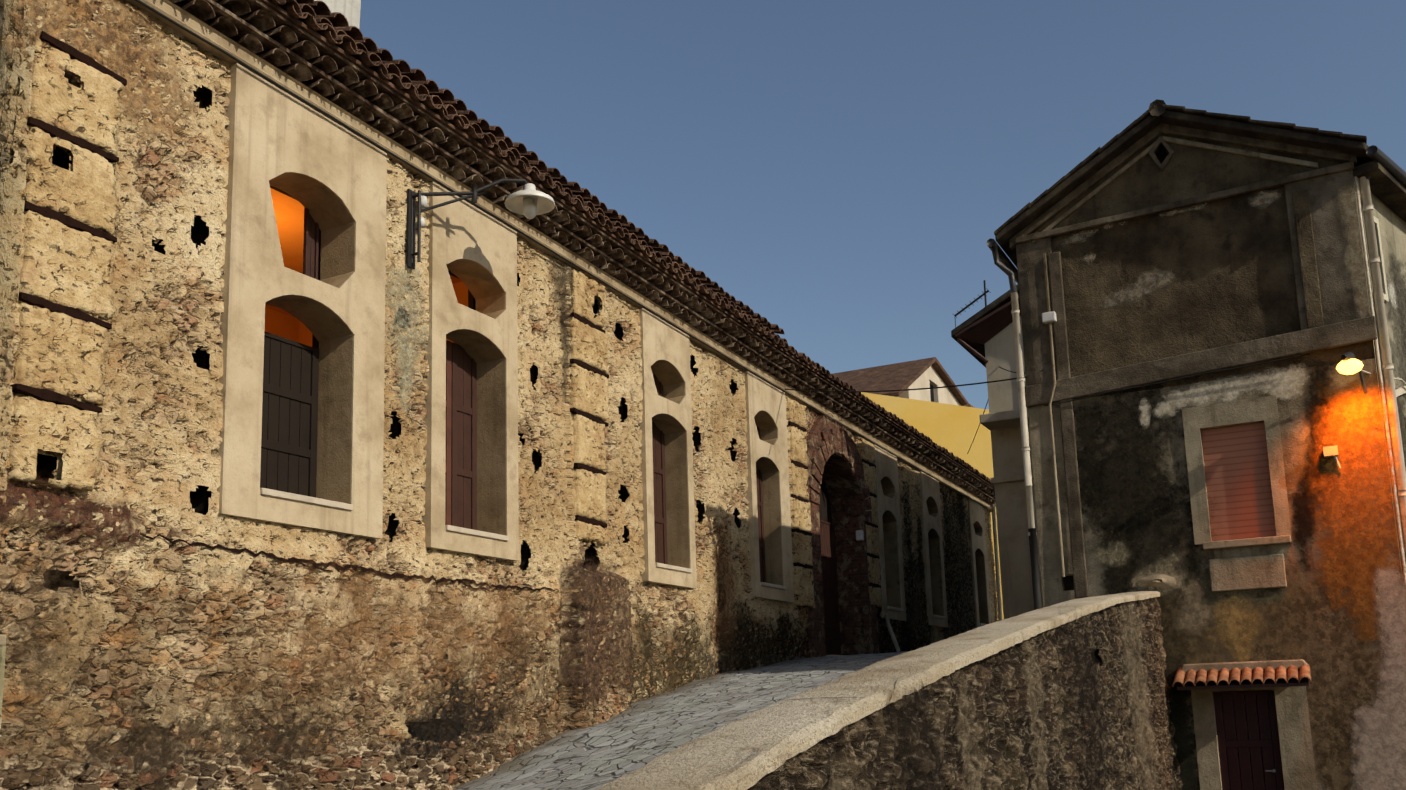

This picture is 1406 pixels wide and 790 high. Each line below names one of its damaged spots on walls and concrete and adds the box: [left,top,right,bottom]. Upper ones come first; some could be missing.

flaking render [1139,366,1308,426]
crack [140,533,559,592]
water stain [1064,362,1390,790]